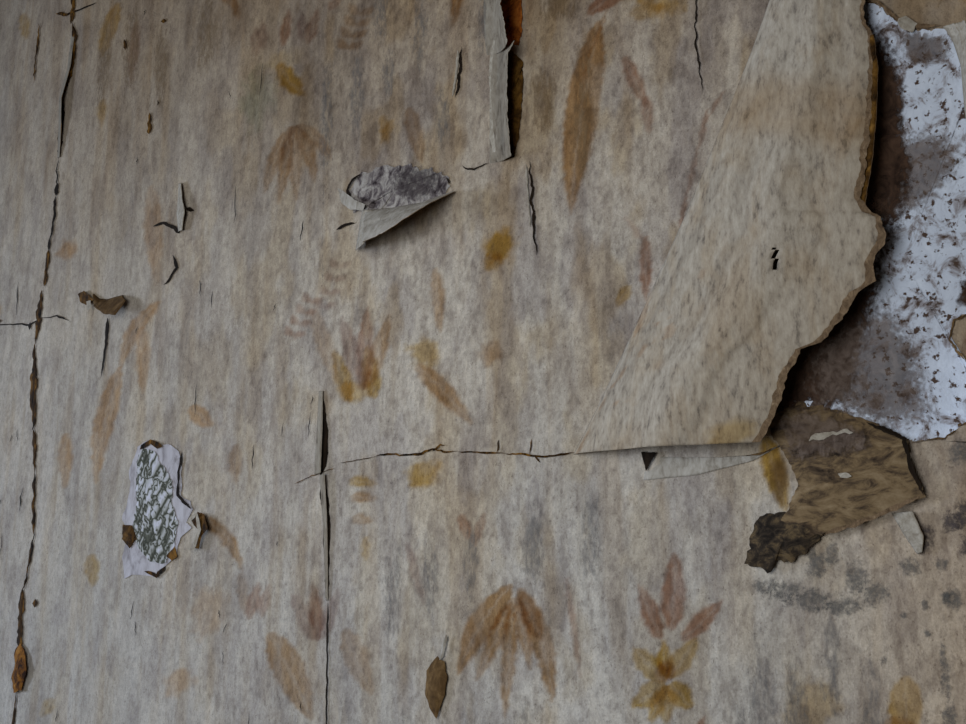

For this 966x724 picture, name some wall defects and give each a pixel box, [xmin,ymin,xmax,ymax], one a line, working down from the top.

crack [147,100,159,134]
peeling [574,0,966,480]
crack [0,0,95,646]
crack [297,439,574,483]
peeling [122,439,208,579]
peeling [892,511,924,554]
water stain [921,505,966,550]
crack [10,692,18,724]